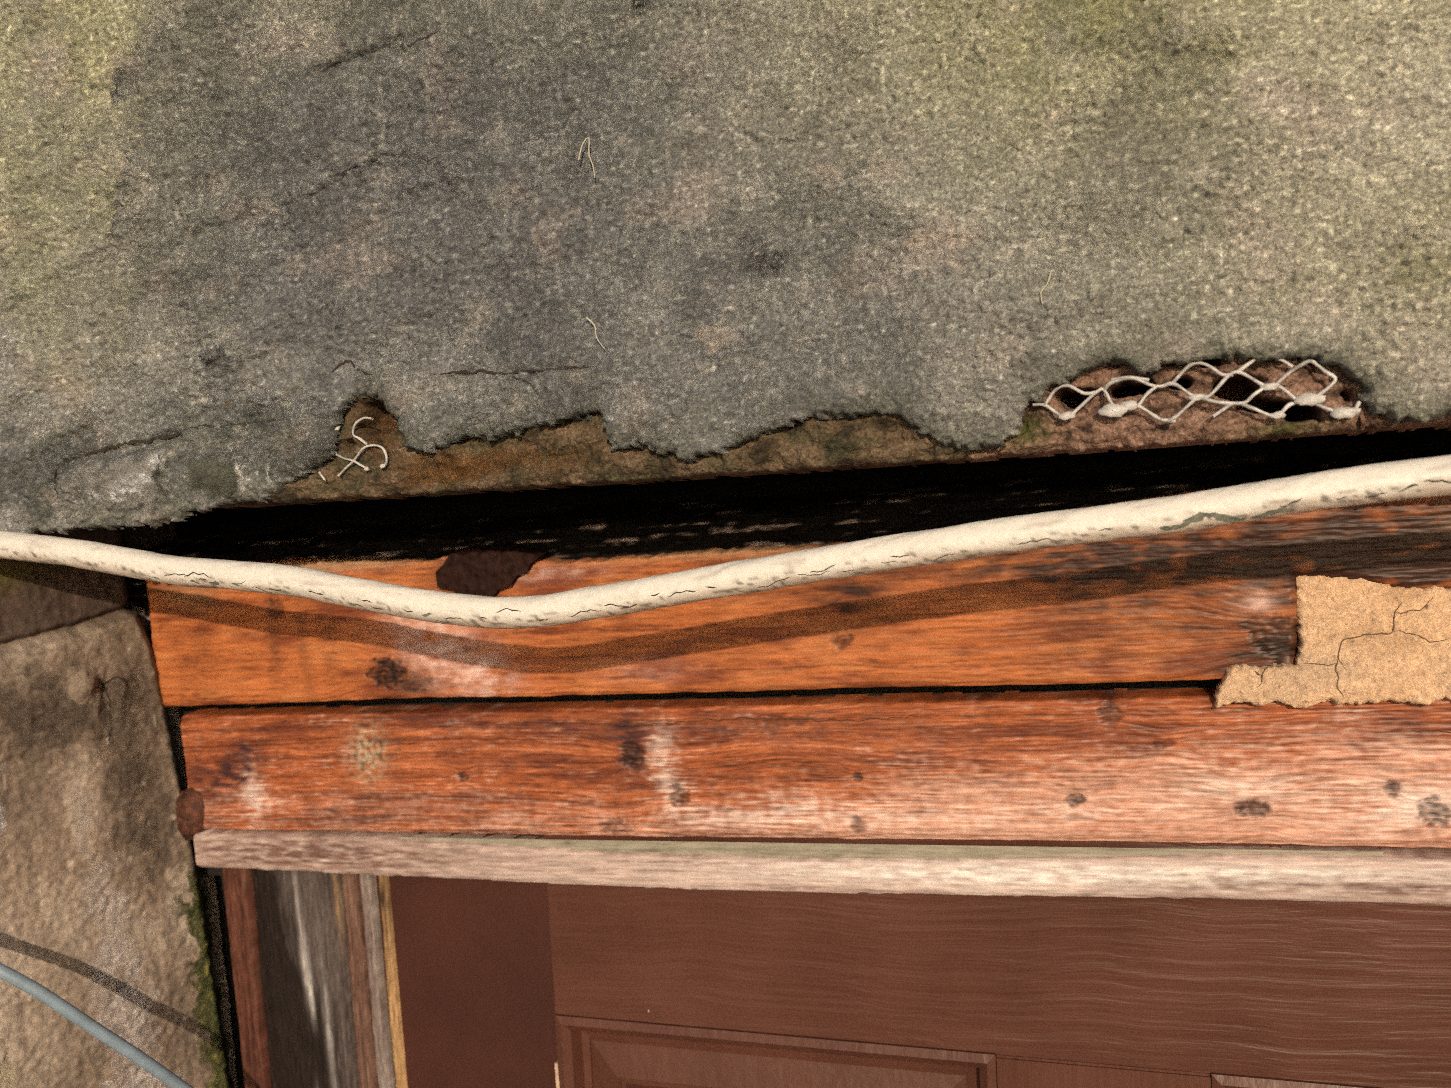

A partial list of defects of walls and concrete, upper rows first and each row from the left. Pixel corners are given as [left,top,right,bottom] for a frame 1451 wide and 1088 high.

spalling [186,355,1451,509]
crack [1255,598,1449,699]